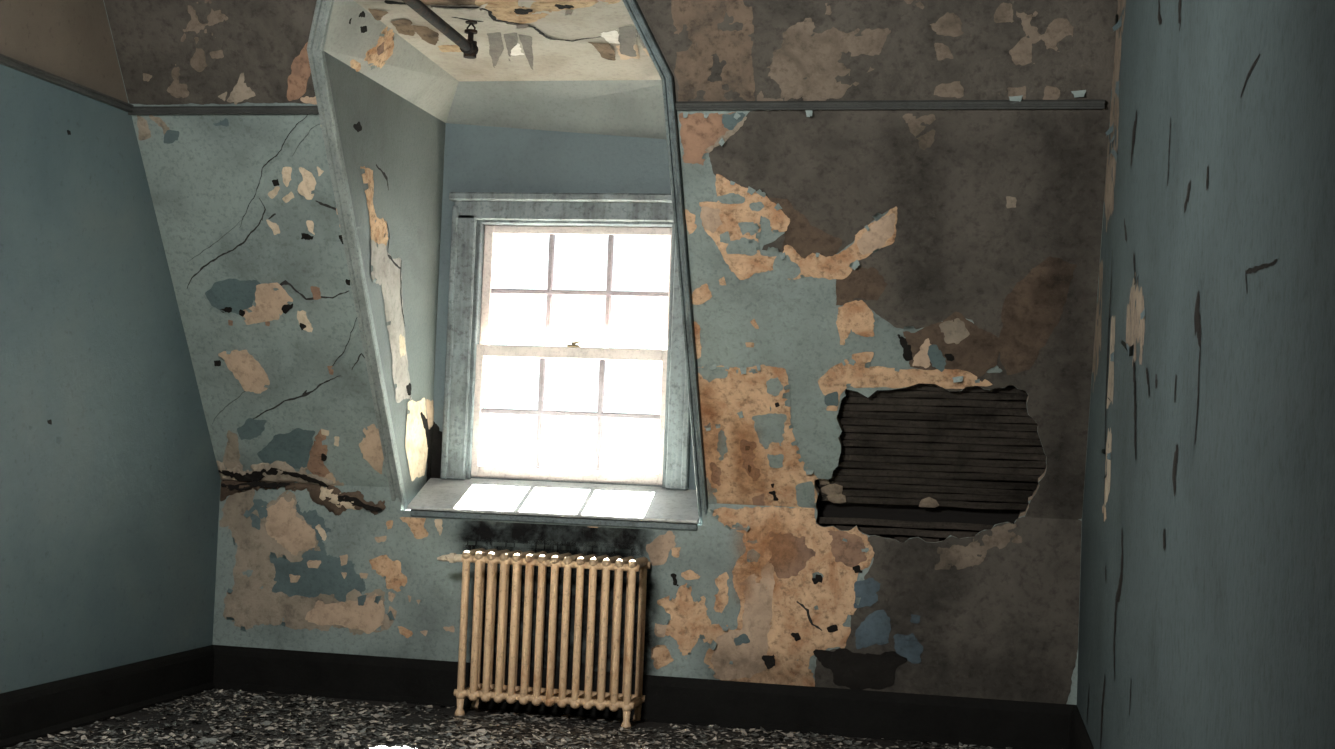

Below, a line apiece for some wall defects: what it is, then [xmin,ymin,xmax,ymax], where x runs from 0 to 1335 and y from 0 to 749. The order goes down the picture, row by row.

peeling [104,0,317,144]
crack [187,114,320,288]
peeling [266,166,343,244]
peeling [214,350,270,394]
peeling [205,279,321,332]
peeling [349,0,1149,704]
peeling [223,418,339,478]
peeling [219,488,455,638]